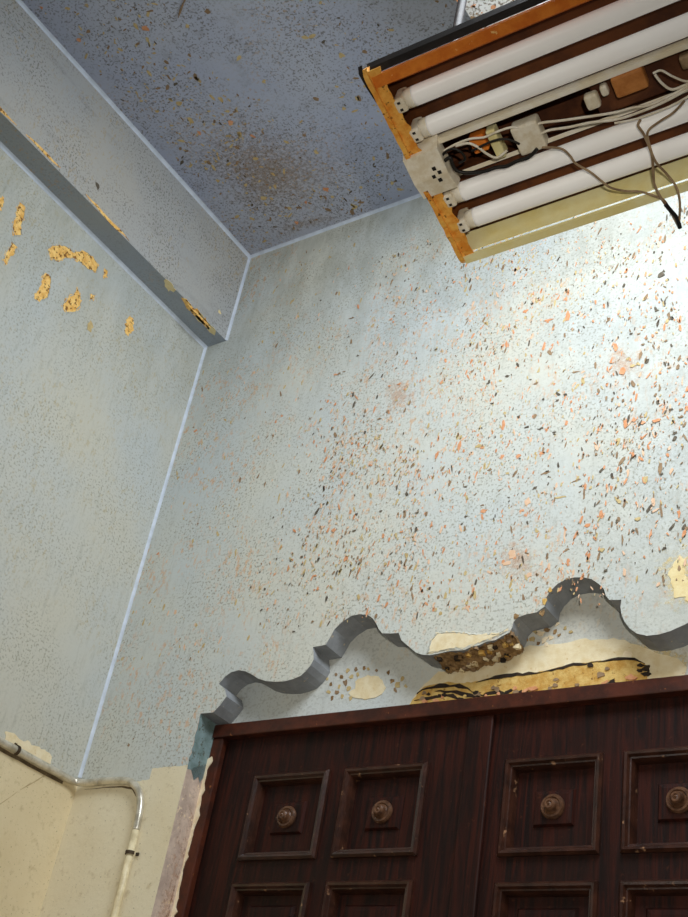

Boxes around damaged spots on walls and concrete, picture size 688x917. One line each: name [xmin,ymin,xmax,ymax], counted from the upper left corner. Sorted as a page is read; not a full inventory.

peeling [2,201,25,266]
peeling [33,272,51,303]
peeling [46,244,108,280]
peeling [61,287,96,314]
peeling [124,316,134,336]
peeling [164,279,216,335]
peeling [227,205,688,641]
flaking render [326,613,687,704]